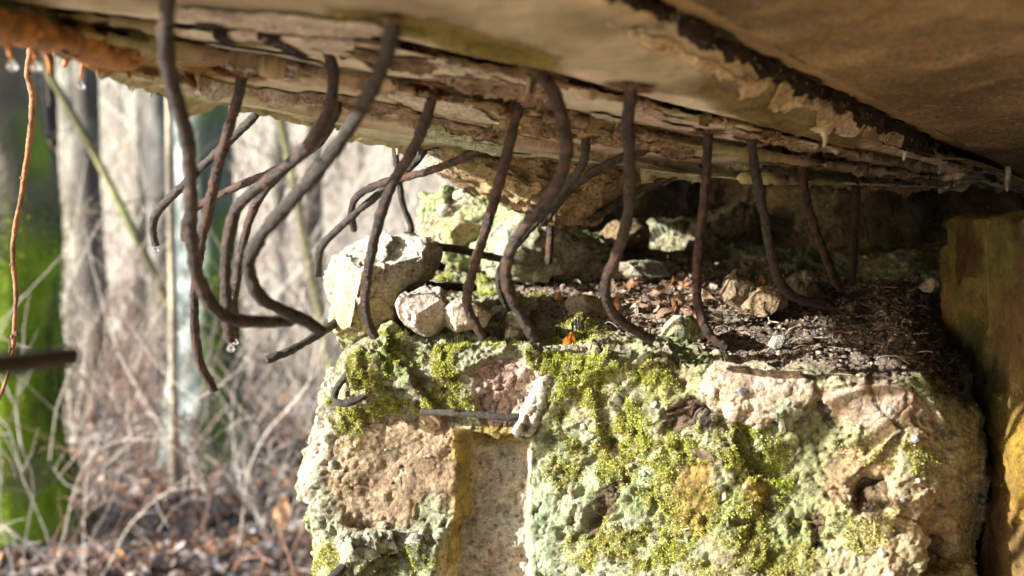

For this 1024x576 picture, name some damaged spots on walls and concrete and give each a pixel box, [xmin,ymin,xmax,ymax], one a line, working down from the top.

spalling [0,0,71,27]
rust [0,6,158,77]
rust [178,63,266,87]
rust [403,80,456,103]
rust [494,97,545,117]
spalling [148,0,939,434]
water stain [298,396,339,508]
water stain [784,416,843,503]
water stain [524,419,571,576]
water stain [357,542,432,576]